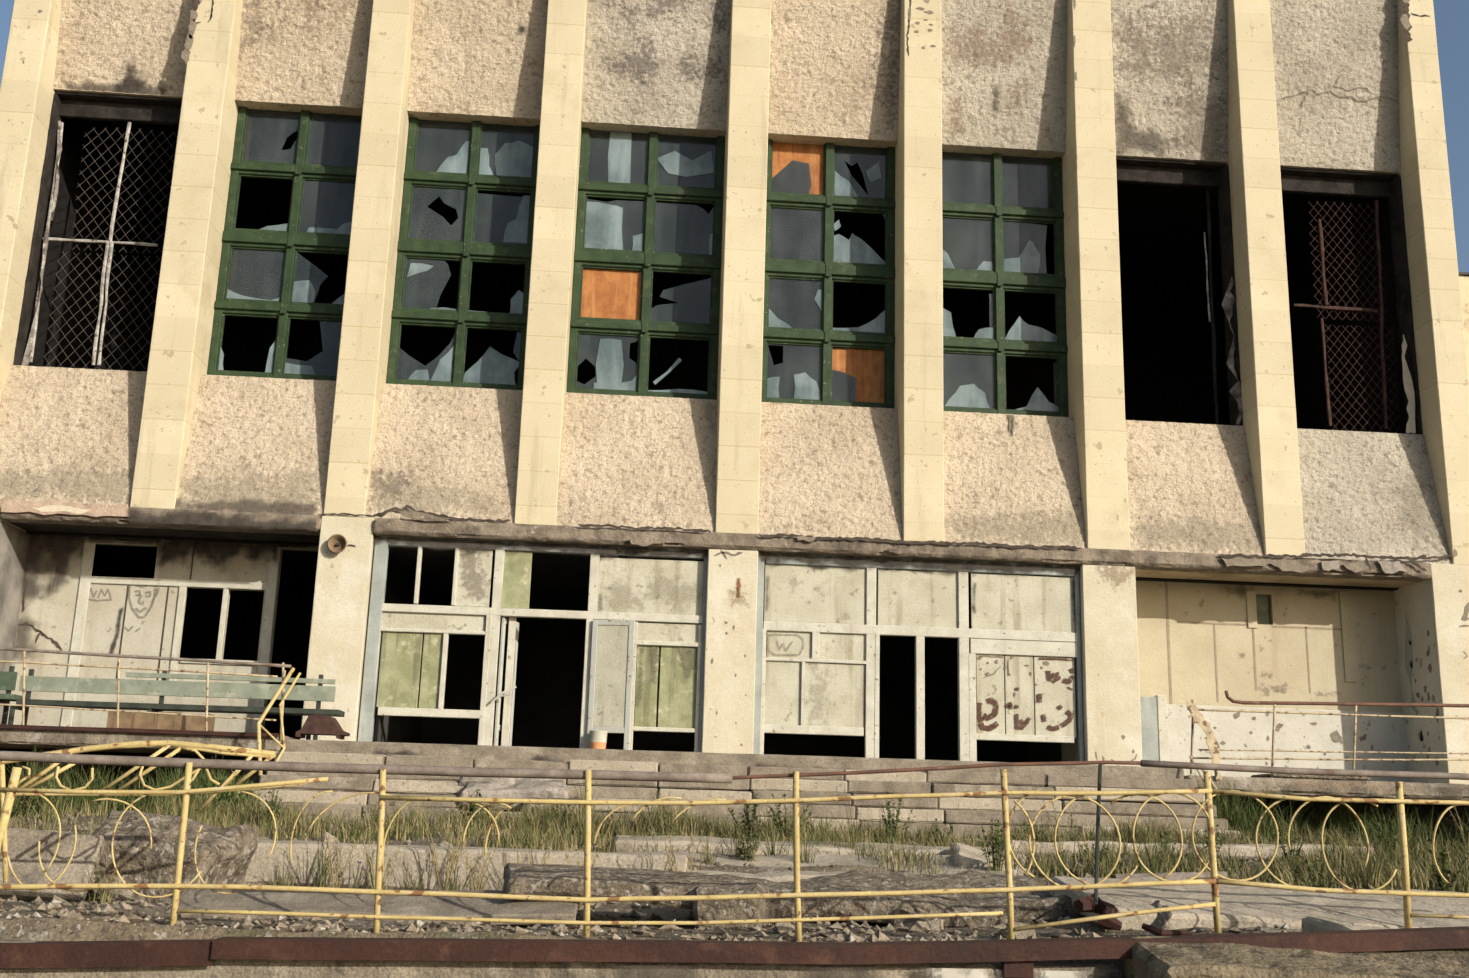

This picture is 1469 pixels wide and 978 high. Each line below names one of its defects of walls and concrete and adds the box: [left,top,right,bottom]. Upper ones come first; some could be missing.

spalling [181,0,214,64]
leakage [589,0,726,85]
spalling [914,0,936,49]
leakage [71,84,164,95]
crack [1282,75,1395,108]
leakage [22,554,68,599]
spalling [1218,553,1427,574]
leakage [13,620,30,659]
peeling [1405,611,1439,766]